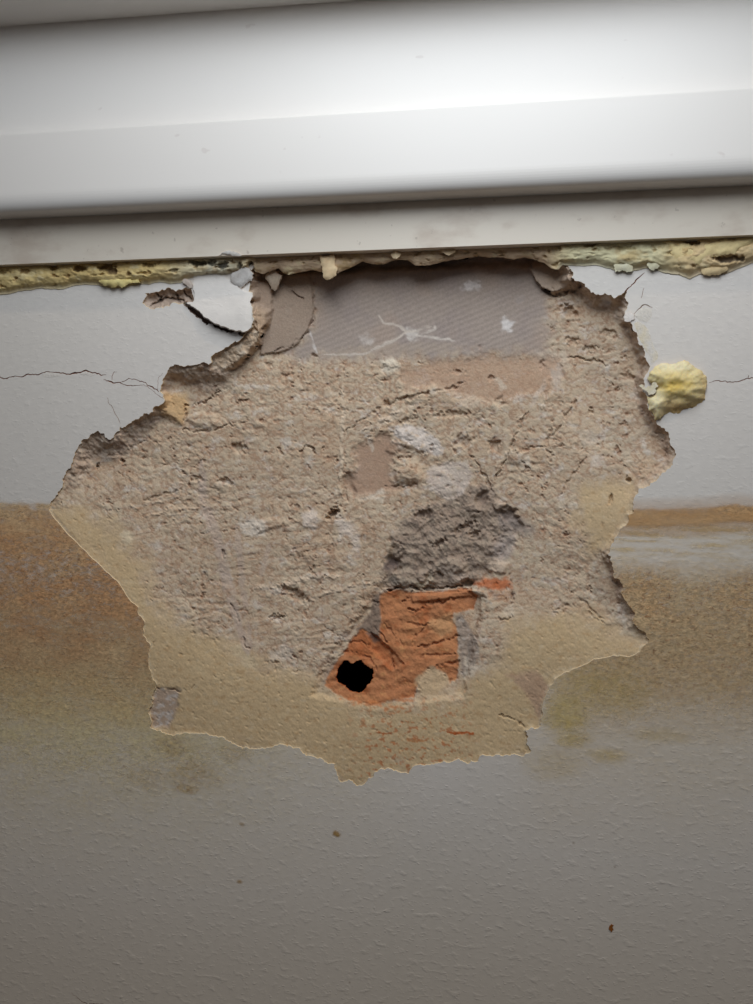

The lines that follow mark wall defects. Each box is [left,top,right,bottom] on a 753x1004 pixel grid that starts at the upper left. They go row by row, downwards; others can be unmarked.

crack [0,370,163,422]
spalling [49,256,676,786]
leakage [626,504,753,542]
leakage [0,503,232,769]
leakage [551,571,753,742]